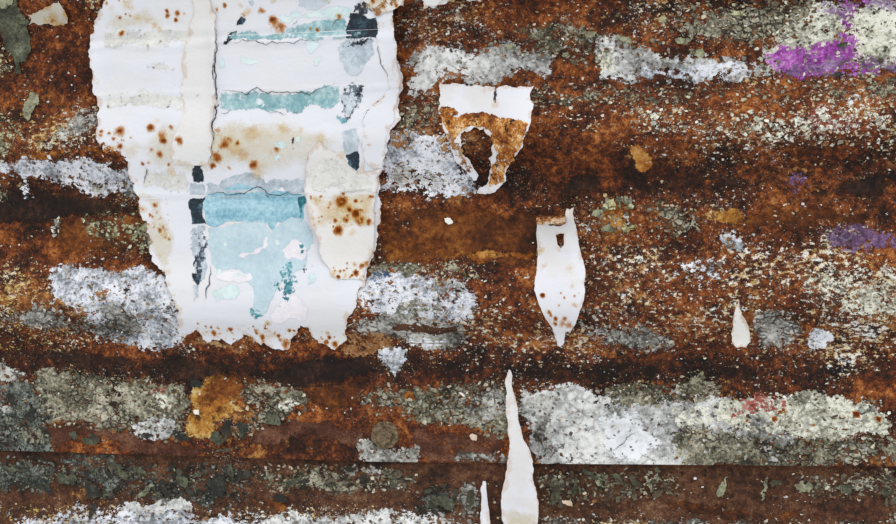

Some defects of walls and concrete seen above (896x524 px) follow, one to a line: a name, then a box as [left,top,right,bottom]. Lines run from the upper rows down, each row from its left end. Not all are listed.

peeling [0,0,53,81]
peeling [103,28,189,50]
corrosion [141,124,182,166]
corrosion [210,129,239,169]
corrosion [389,106,528,187]
corrosion [0,186,170,258]
corrosion [310,192,538,267]
peeling [308,0,896,524]
corrosion [705,171,896,231]
corrosion [0,331,394,456]
peeling [0,211,500,524]
corrosion [410,426,505,463]